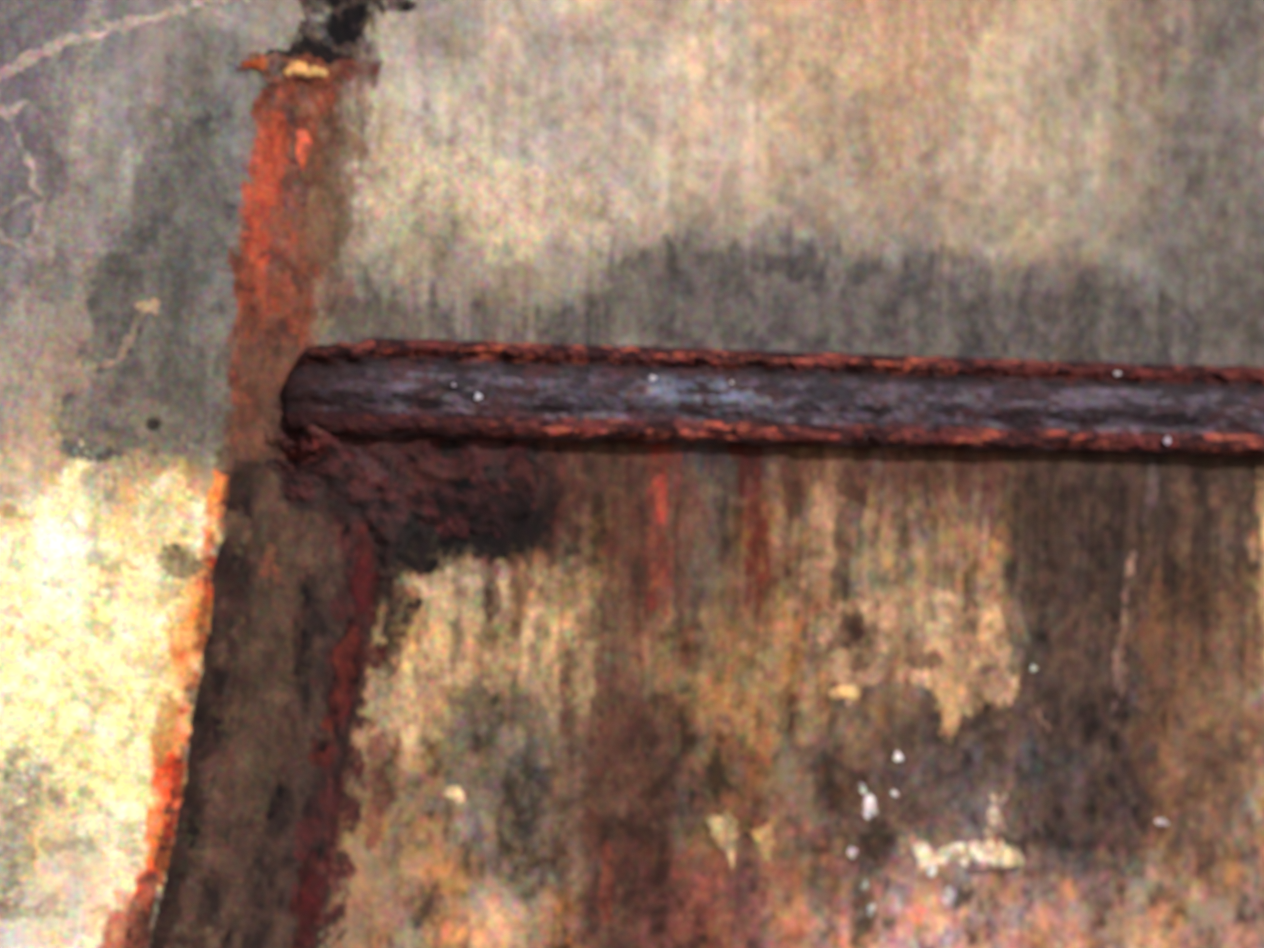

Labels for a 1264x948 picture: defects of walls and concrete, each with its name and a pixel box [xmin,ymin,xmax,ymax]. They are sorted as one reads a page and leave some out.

crack [0,0,250,261]
corrosion [190,72,387,542]
leakage [281,0,419,59]
leakage [321,0,1264,368]
corrosion [94,582,197,948]
corrosion [289,845,324,948]
corrosion [307,614,364,767]
corrosion [361,730,400,854]
corrosion [363,905,399,948]
leakage [270,440,578,926]
corrosion [480,441,1030,948]
leakage [698,451,1264,877]